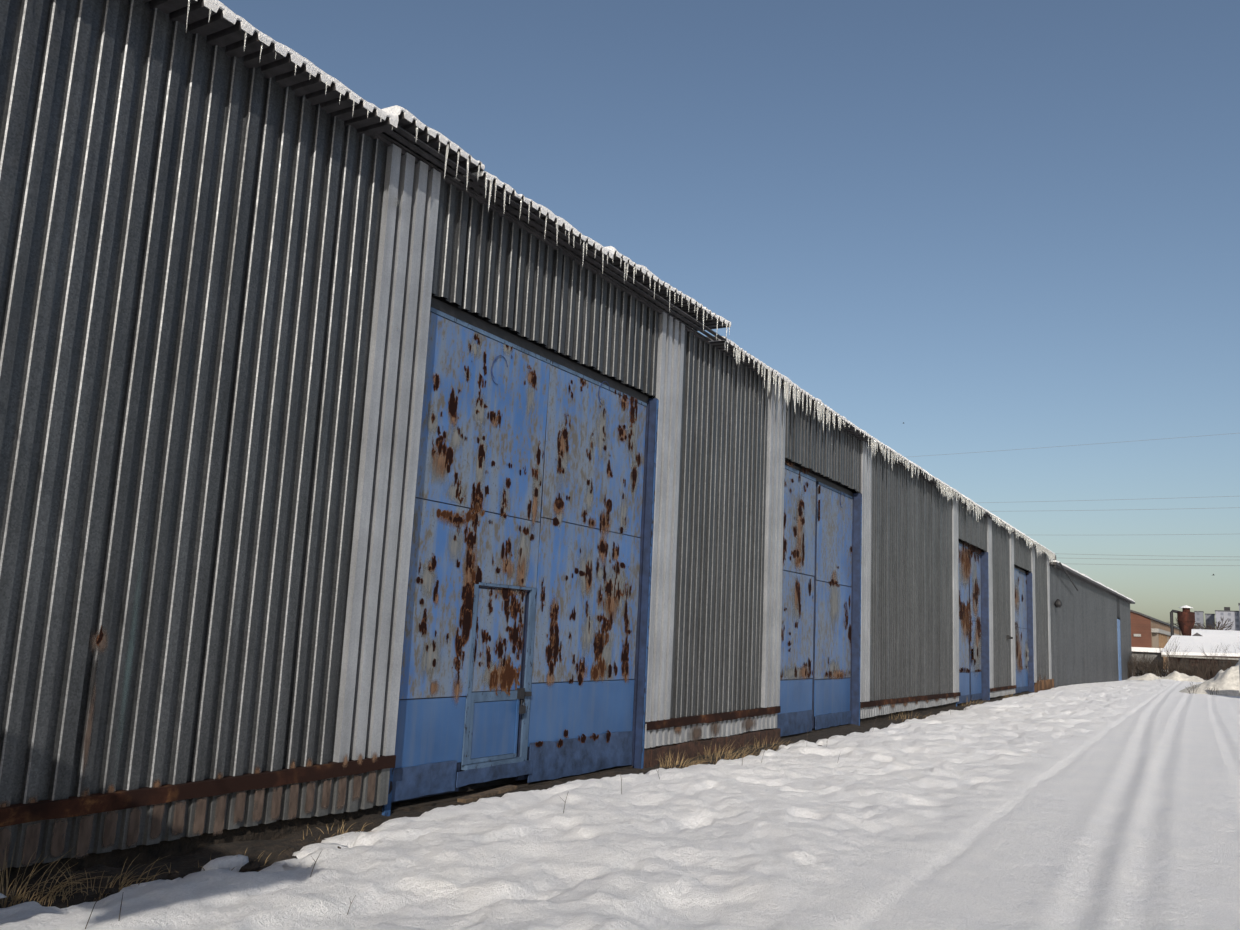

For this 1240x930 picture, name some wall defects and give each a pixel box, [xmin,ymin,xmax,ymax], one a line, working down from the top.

rust [0,753,377,870]